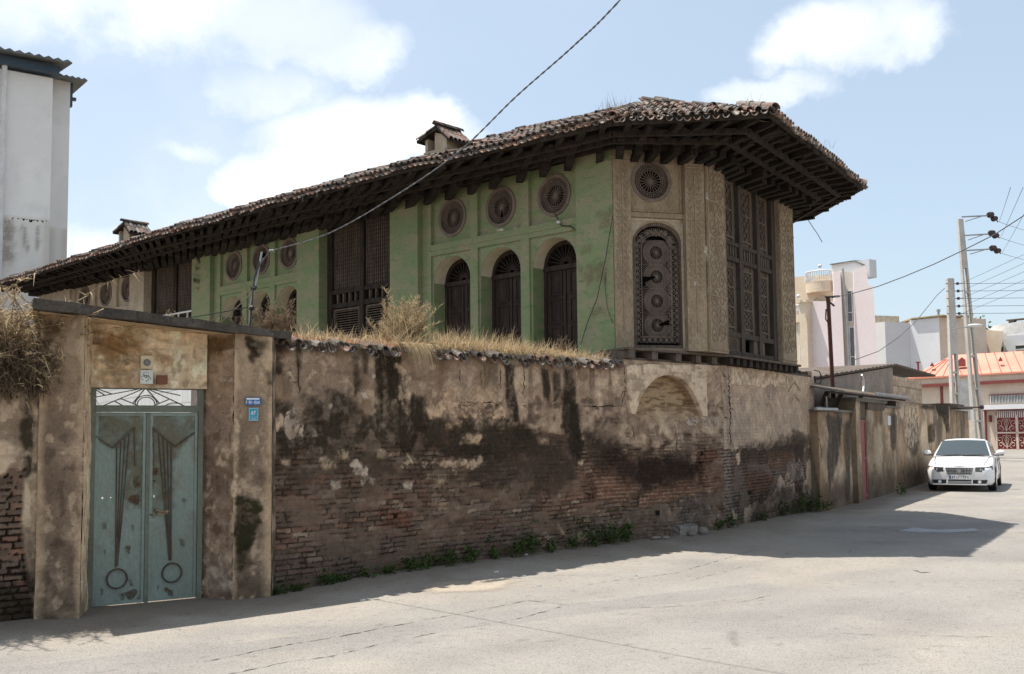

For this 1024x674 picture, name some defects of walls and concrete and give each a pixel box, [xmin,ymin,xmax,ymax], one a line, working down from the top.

flaking render [0,377,38,557]
flaking render [319,449,374,485]
damp [272,351,583,495]
flaking render [401,386,508,484]
spalling [590,450,719,516]
crack [724,372,734,450]
damp [740,430,810,465]
damp [826,413,851,500]
damp [891,404,950,456]